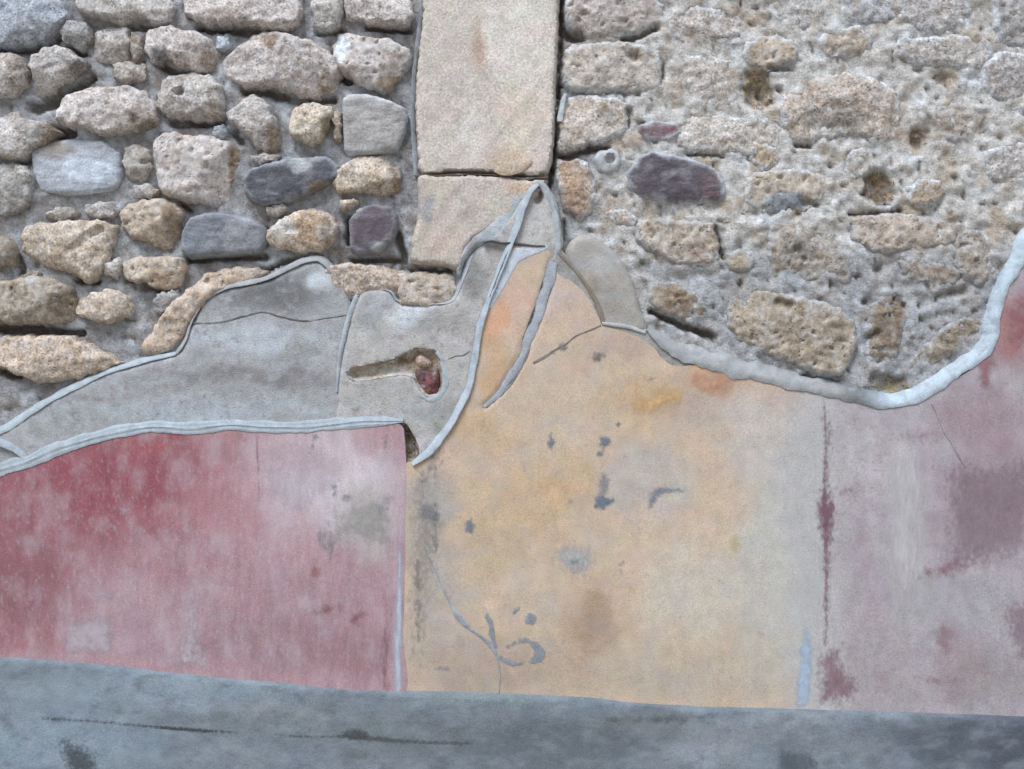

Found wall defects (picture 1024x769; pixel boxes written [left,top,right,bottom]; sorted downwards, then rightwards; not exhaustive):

crack [188,312,346,324]
flaking render [0,186,695,462]
crack [483,240,601,408]
crack [424,546,545,692]